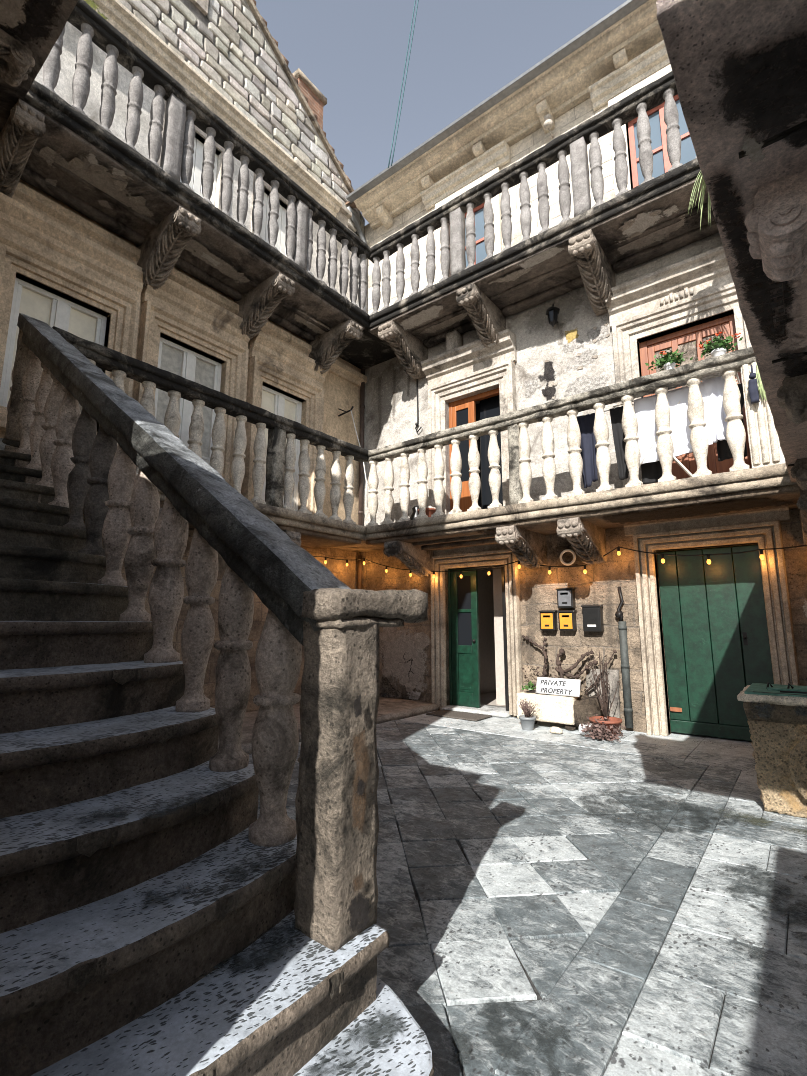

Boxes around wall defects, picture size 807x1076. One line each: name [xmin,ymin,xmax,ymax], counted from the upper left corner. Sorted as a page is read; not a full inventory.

spalling [0,0,28,29]
water stain [708,34,807,162]
flaking render [39,146,158,217]
water stain [706,174,807,378]